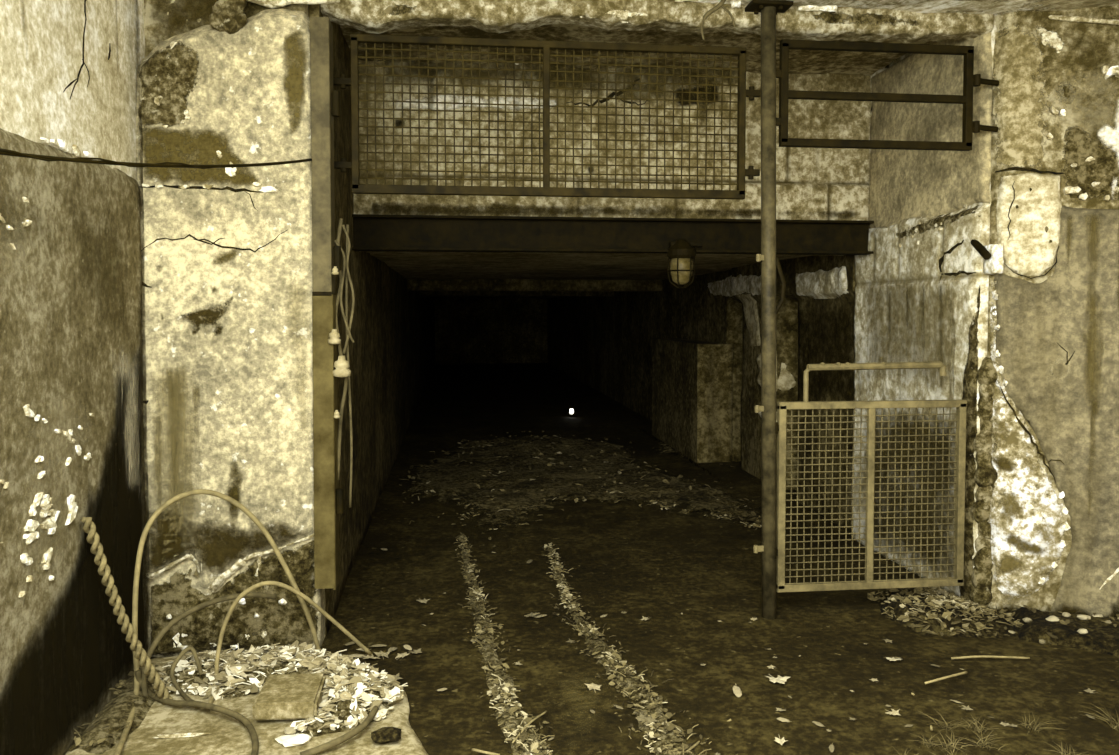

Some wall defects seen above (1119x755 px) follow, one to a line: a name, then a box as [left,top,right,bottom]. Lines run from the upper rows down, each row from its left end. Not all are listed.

peeling [138,41,278,193]
spalling [209,0,340,34]
water stain [284,32,306,131]
spalling [1045,82,1119,201]
spalling [1101,65,1119,80]
crack [141,230,287,252]
water stain [0,0,297,755]
peeling [959,281,1071,608]